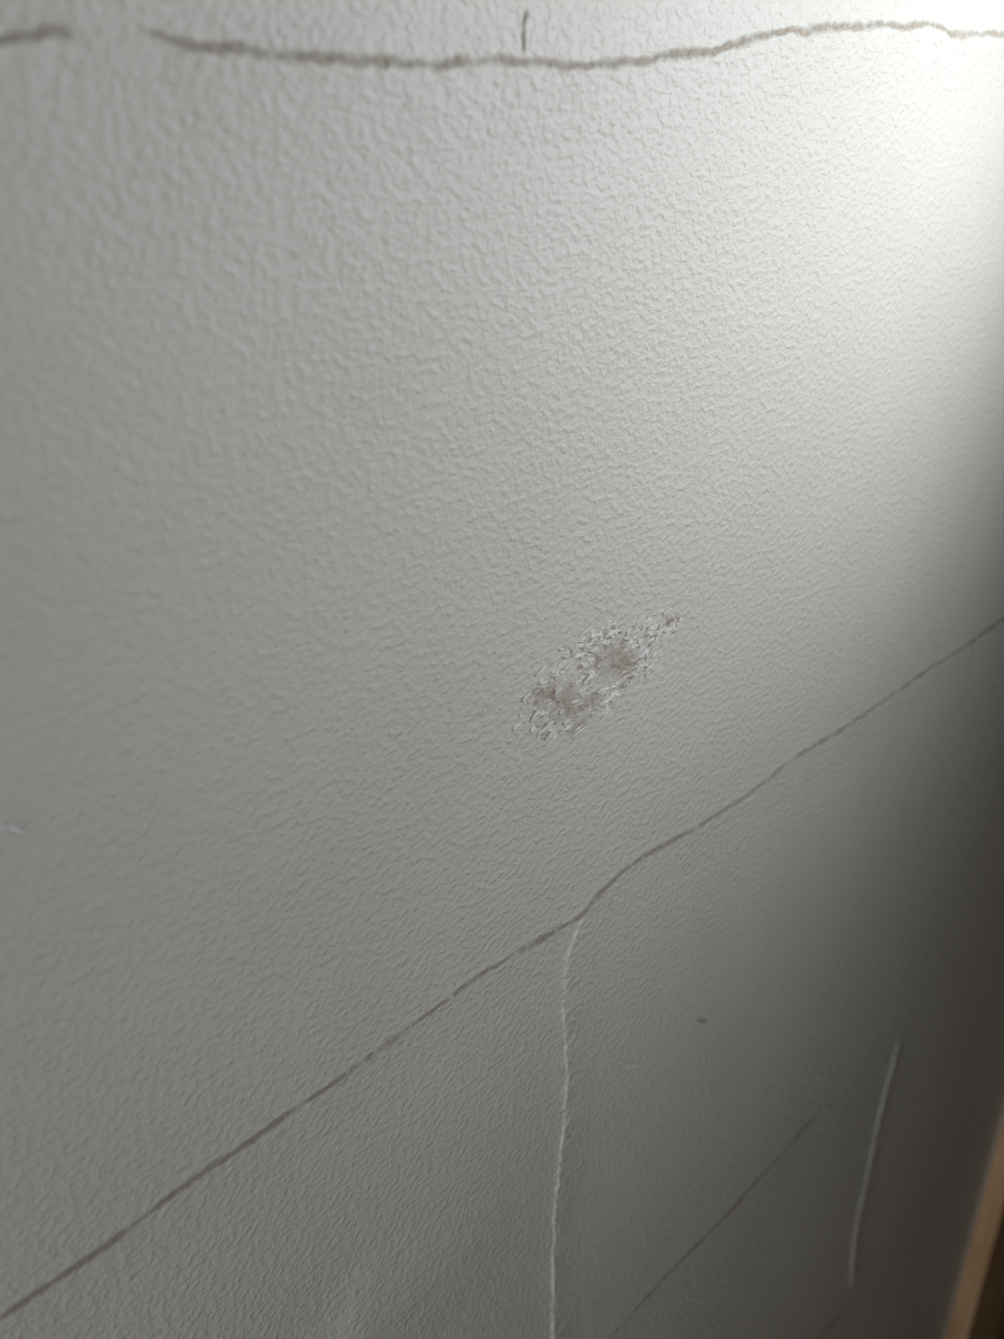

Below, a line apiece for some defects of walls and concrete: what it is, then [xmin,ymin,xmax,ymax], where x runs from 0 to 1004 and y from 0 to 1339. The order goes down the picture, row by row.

crack [0,17,69,148]
crack [152,12,1004,158]
crack [845,1036,909,1289]